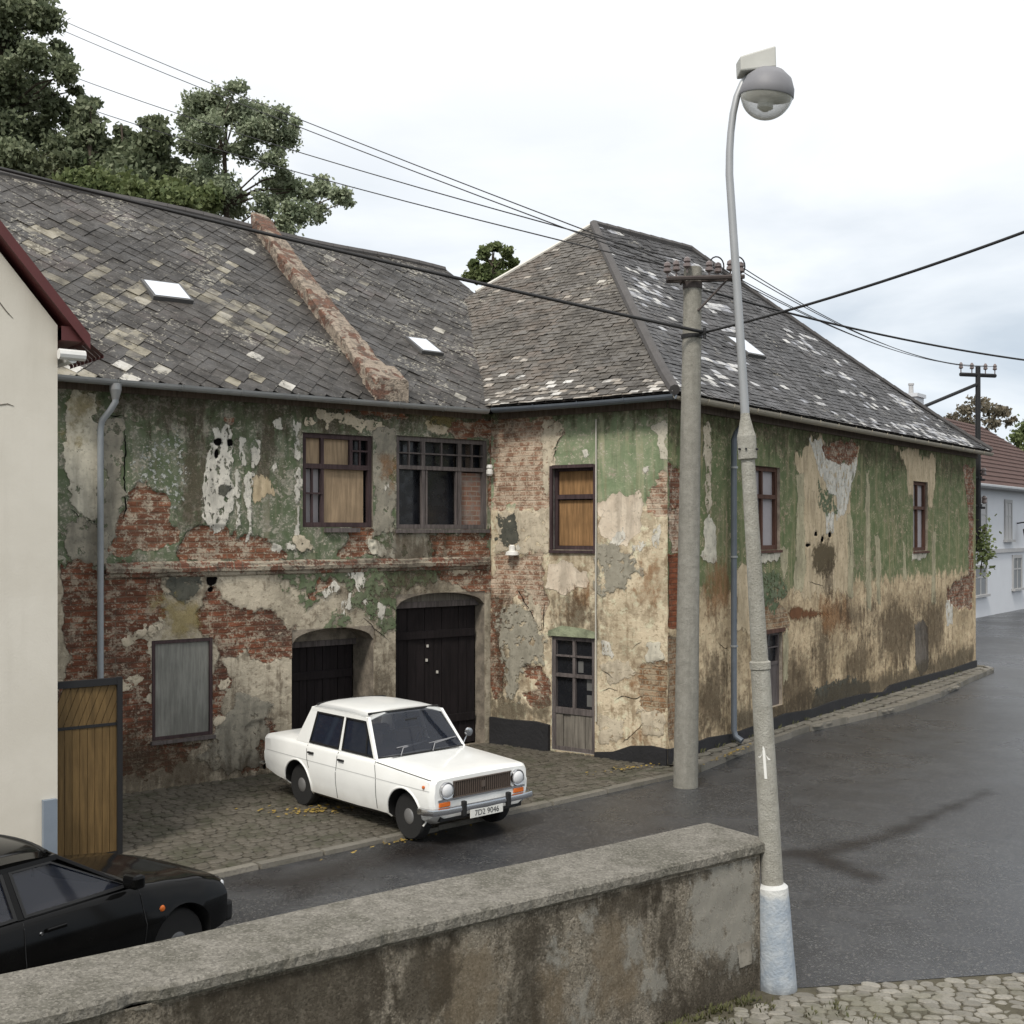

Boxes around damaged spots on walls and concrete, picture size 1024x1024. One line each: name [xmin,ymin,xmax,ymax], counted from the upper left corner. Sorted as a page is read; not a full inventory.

flaking render [58,389,680,782]
peeling [761,433,881,685]
water stain [811,539,836,578]
flaking render [903,464,975,626]
water stain [737,705,753,730]
water stain [773,645,974,718]